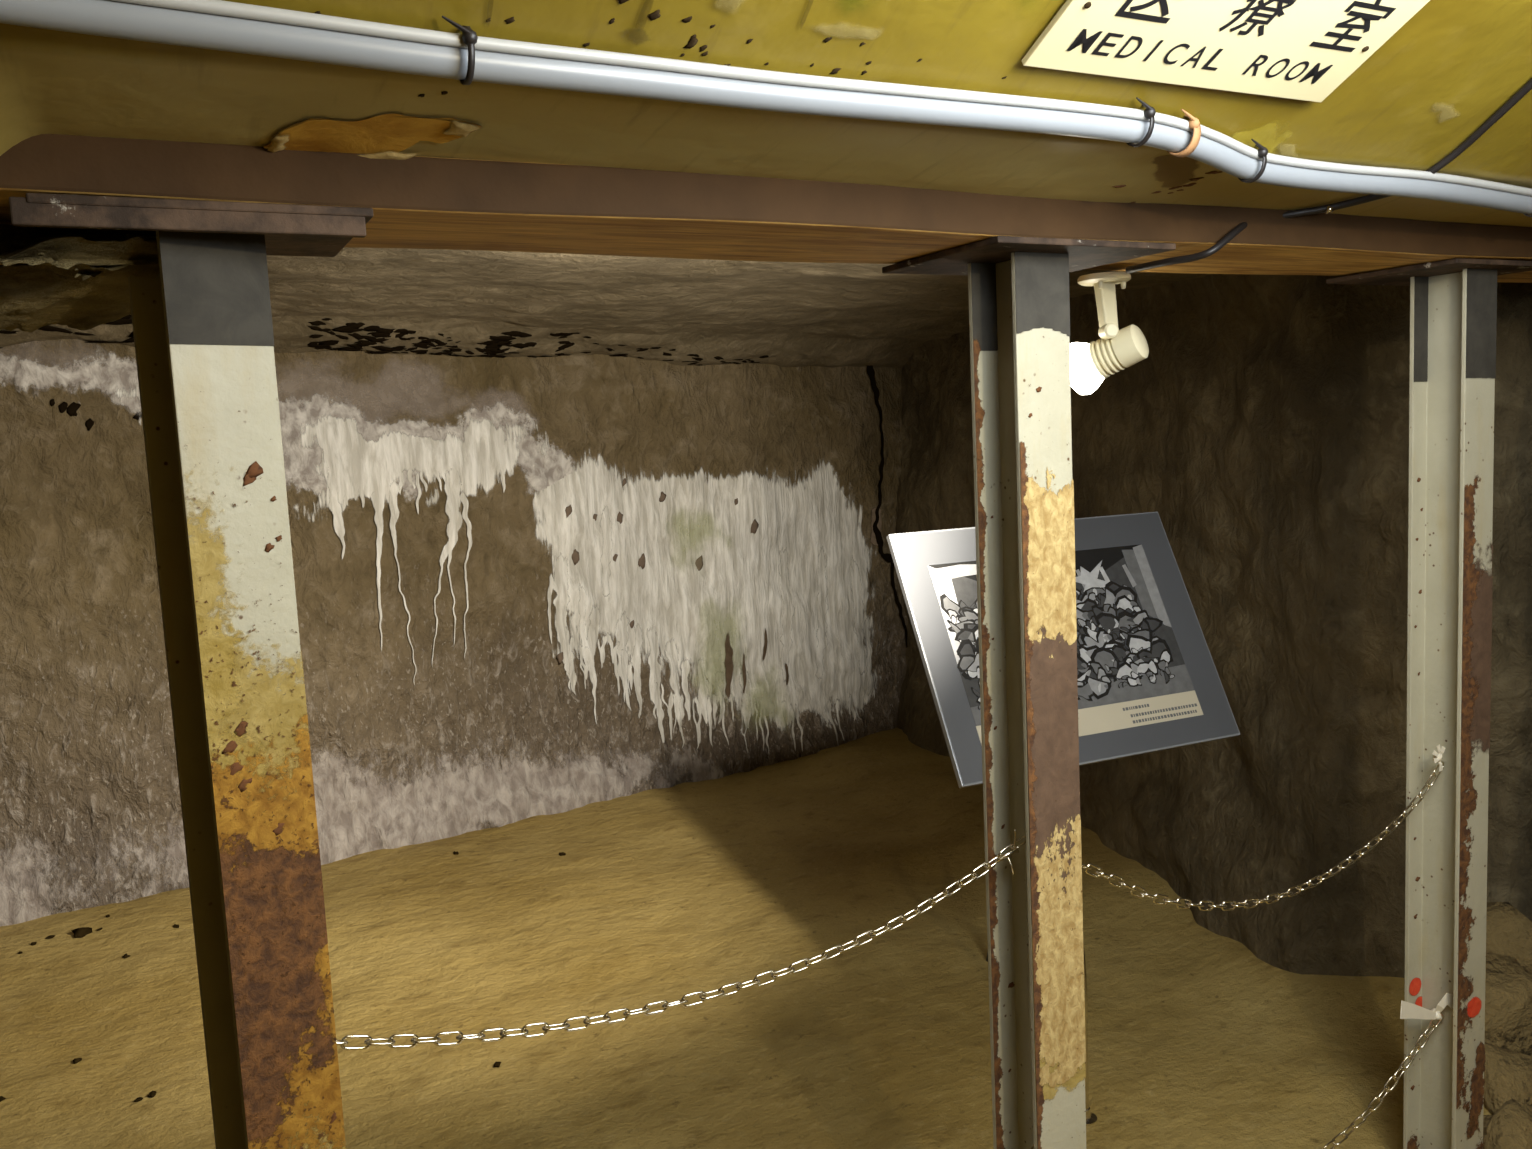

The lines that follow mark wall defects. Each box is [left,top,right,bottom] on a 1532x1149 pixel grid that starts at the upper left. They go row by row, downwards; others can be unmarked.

peeling [264,113,481,160]
water stain [0,837,84,927]
water stain [0,354,141,423]
water stain [96,820,189,897]
corrosion [187,491,346,1149]
water stain [278,370,886,865]
corrosion [973,339,1005,1149]
corrosion [1020,441,1086,1149]
corrosion [1456,475,1493,1113]